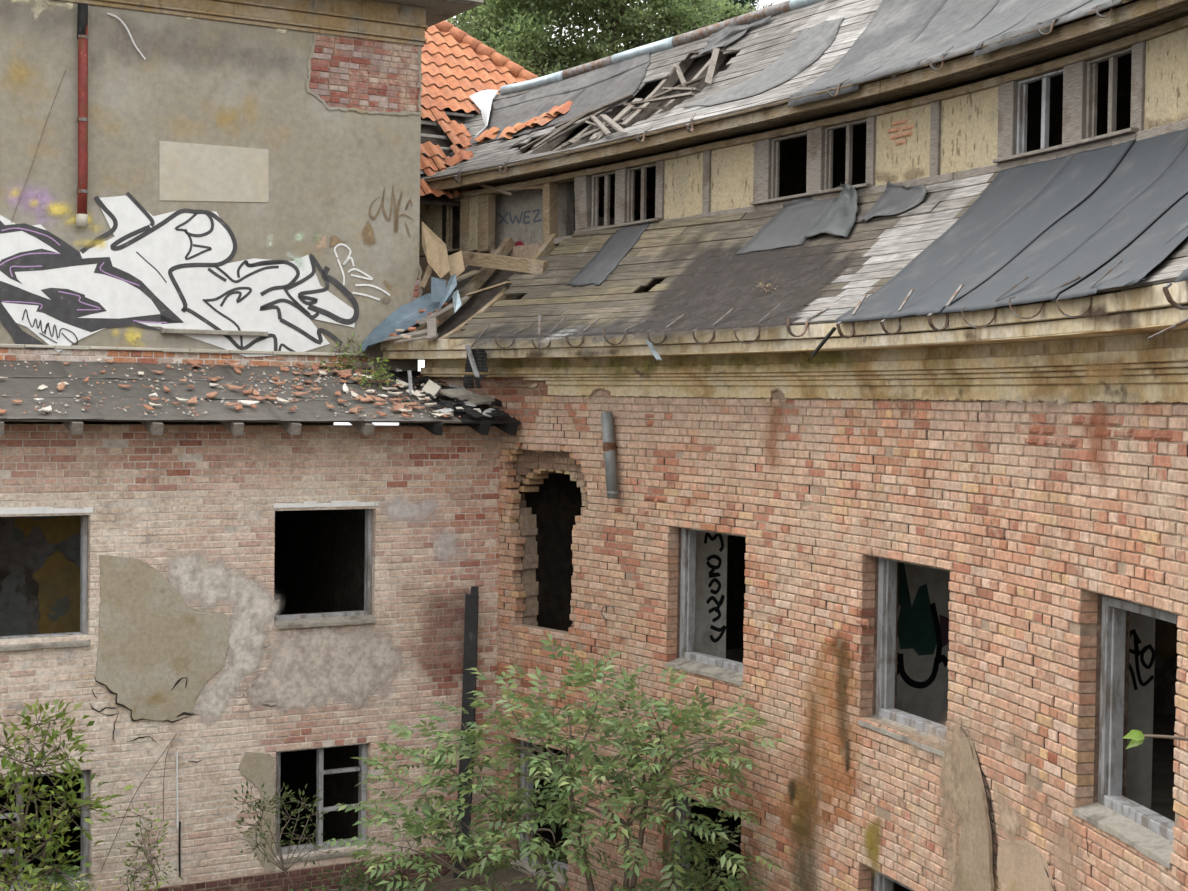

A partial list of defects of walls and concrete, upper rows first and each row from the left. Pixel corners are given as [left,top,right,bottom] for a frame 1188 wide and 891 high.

peeling [11,0,73,17]
spalling [306,33,423,117]
leakage [799,352,852,366]
spalling [507,442,588,530]
leakage [866,821,879,866]